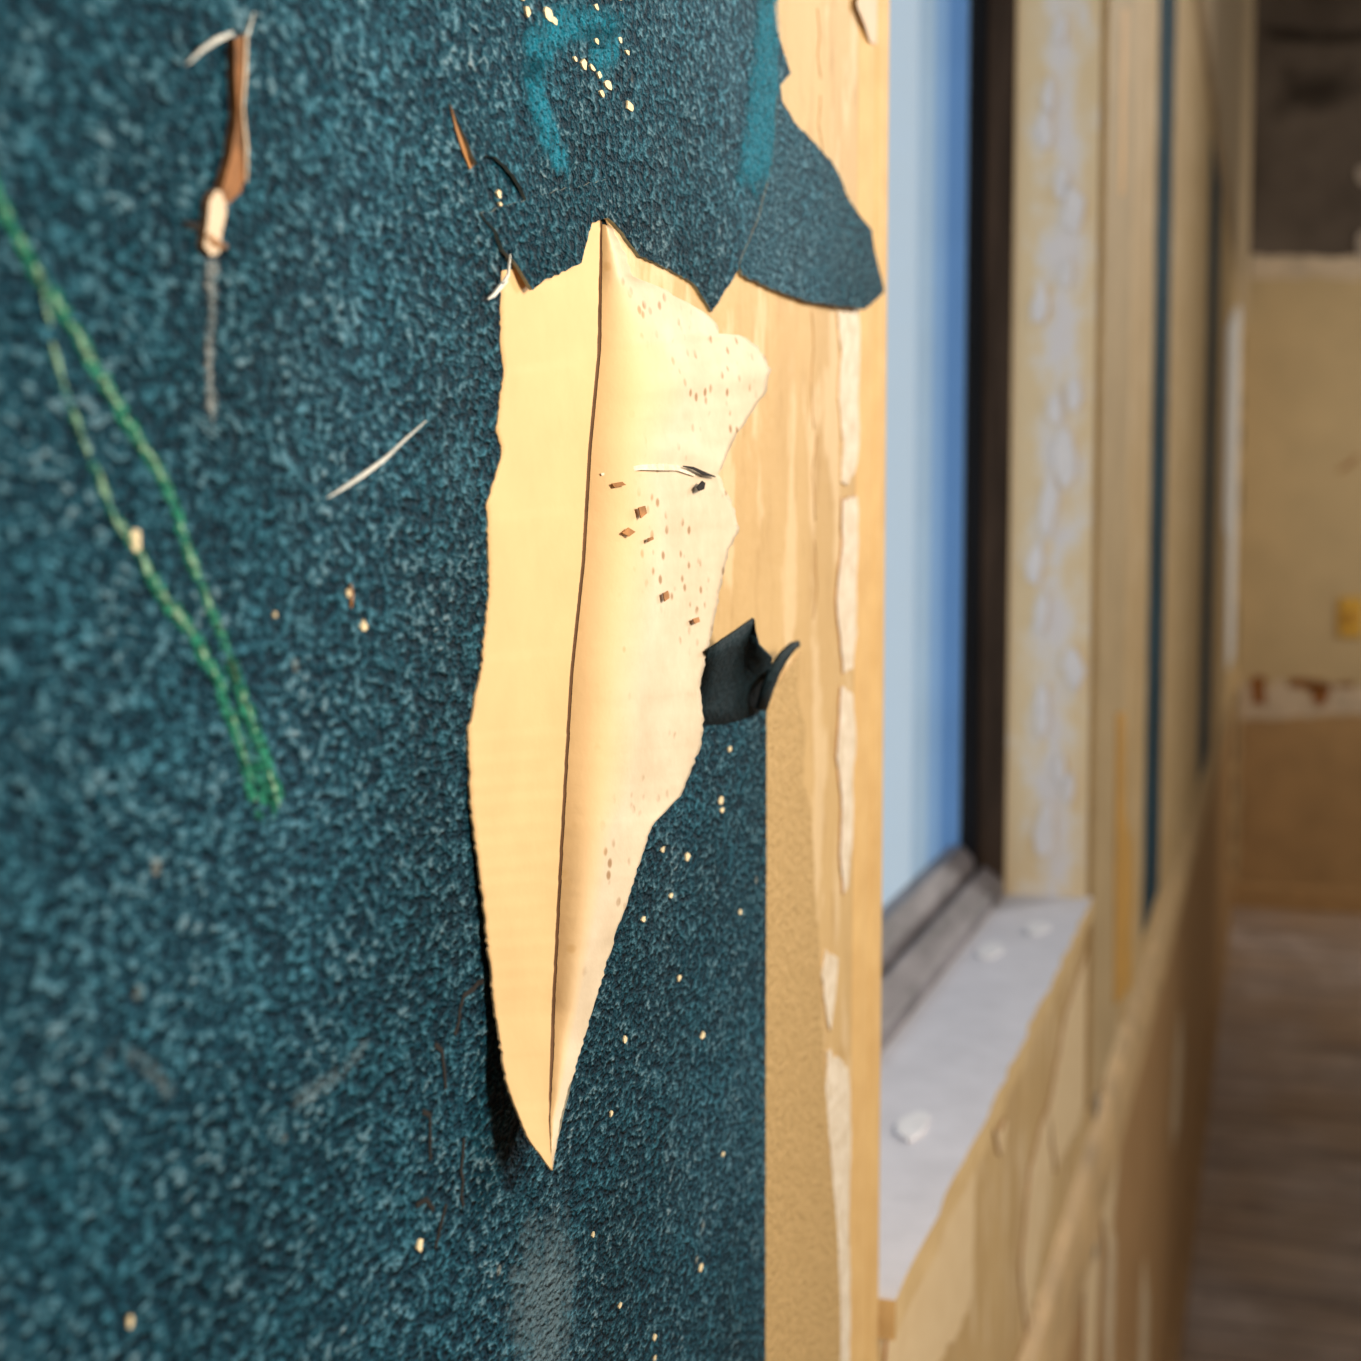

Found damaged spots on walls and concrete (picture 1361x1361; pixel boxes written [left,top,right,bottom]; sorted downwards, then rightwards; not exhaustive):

peeling [521,0,558,25]
peeling [856,0,877,45]
peeling [572,56,612,97]
peeling [738,94,884,894]
peeling [449,97,800,1170]